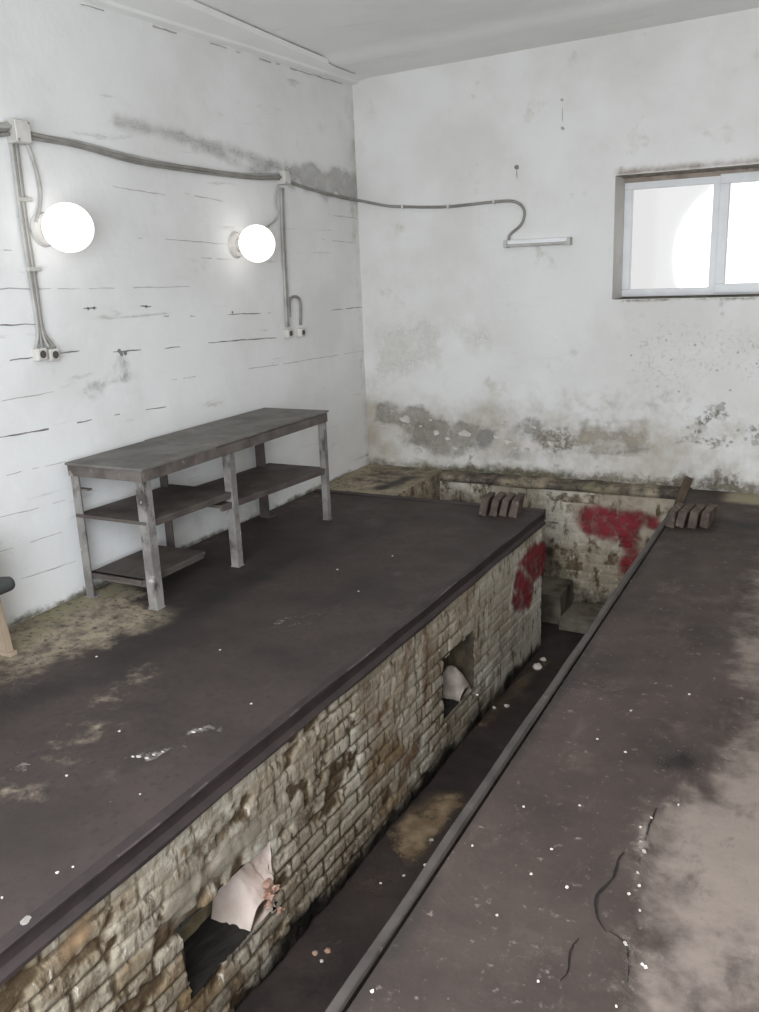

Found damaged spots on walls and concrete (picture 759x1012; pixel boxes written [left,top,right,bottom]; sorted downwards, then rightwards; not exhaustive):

peeling [390,410,471,450]
water stain [377,404,494,455]
water stain [525,419,643,452]
peeling [675,402,727,444]
water stain [451,467,569,477]
water stain [706,470,758,493]
spalling [0,481,675,1012]
crack [594,808,657,981]
crack [560,938,579,981]